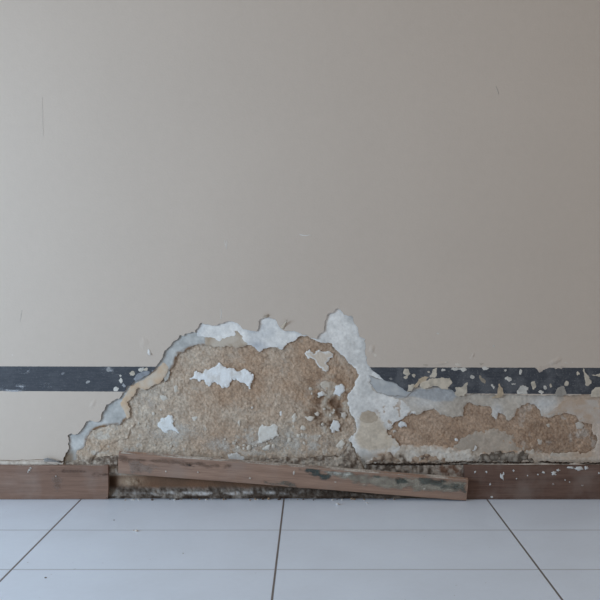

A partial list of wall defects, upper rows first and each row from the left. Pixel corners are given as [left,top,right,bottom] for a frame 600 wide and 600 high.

spalling [44,308,600,499]